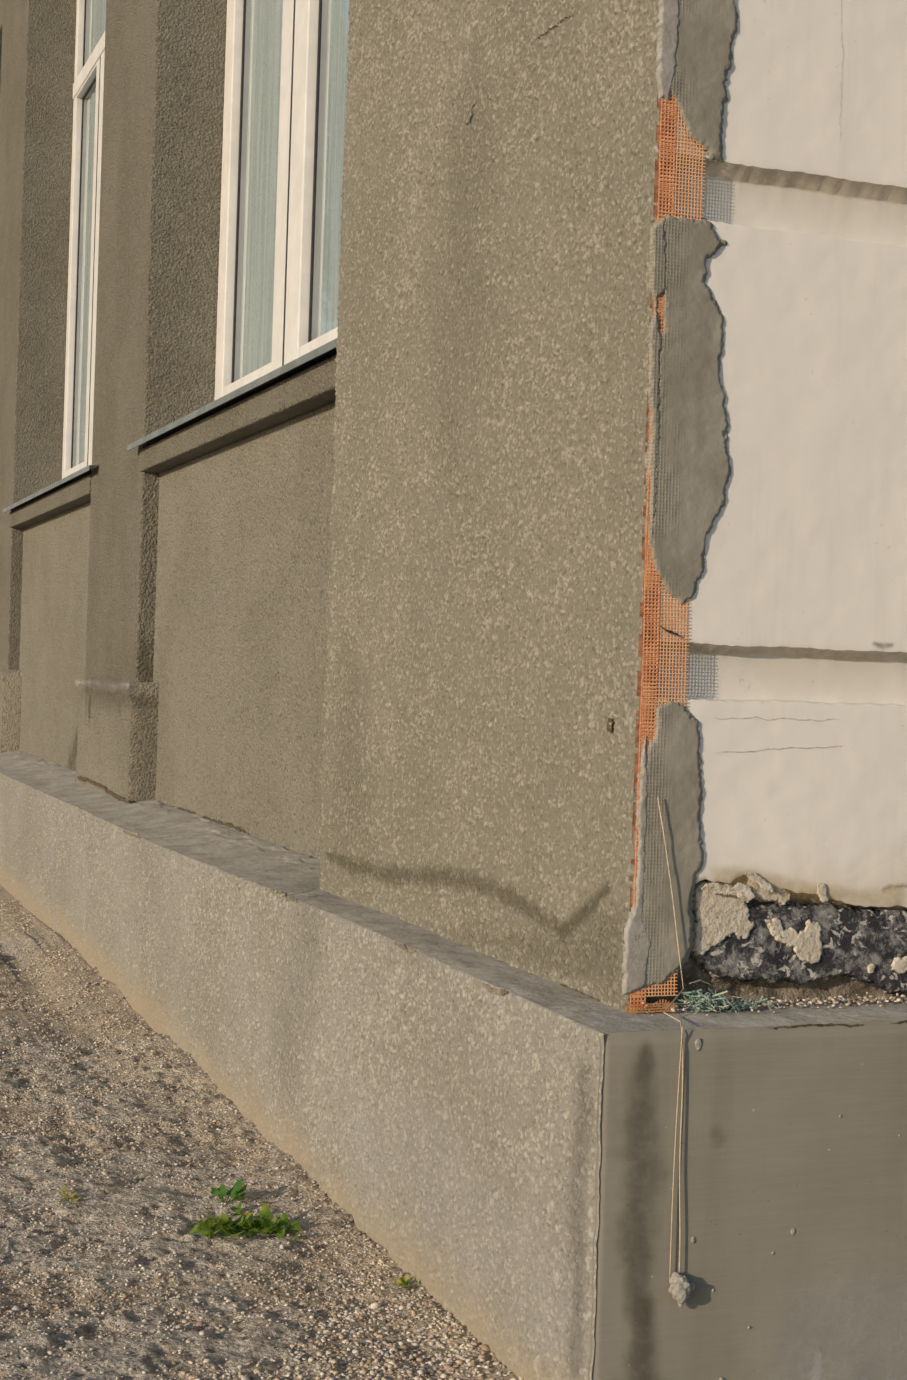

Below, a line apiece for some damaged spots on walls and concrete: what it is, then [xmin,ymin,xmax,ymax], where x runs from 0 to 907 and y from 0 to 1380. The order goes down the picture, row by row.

peeling [816,883,829,902]
peeling [691,872,822,964]
peeling [867,956,907,974]